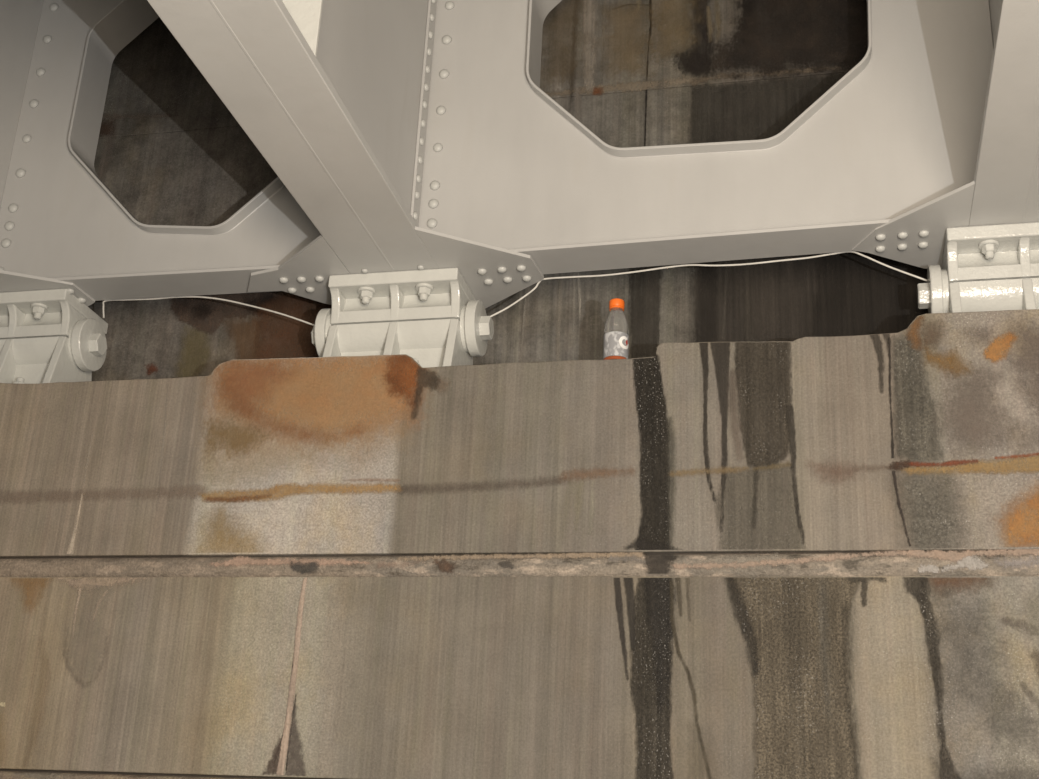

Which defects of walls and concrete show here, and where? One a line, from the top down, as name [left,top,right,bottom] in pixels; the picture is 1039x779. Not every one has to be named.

corrosion [202,483,397,502]
corrosion [218,294,420,435]
water stain [614,266,711,779]
water stain [694,251,939,549]
corrosion [908,316,966,373]
corrosion [889,453,1039,474]
corrosion [984,333,1016,361]
corrosion [1007,493,1039,546]
crack [263,578,307,776]
water stain [726,577,886,779]